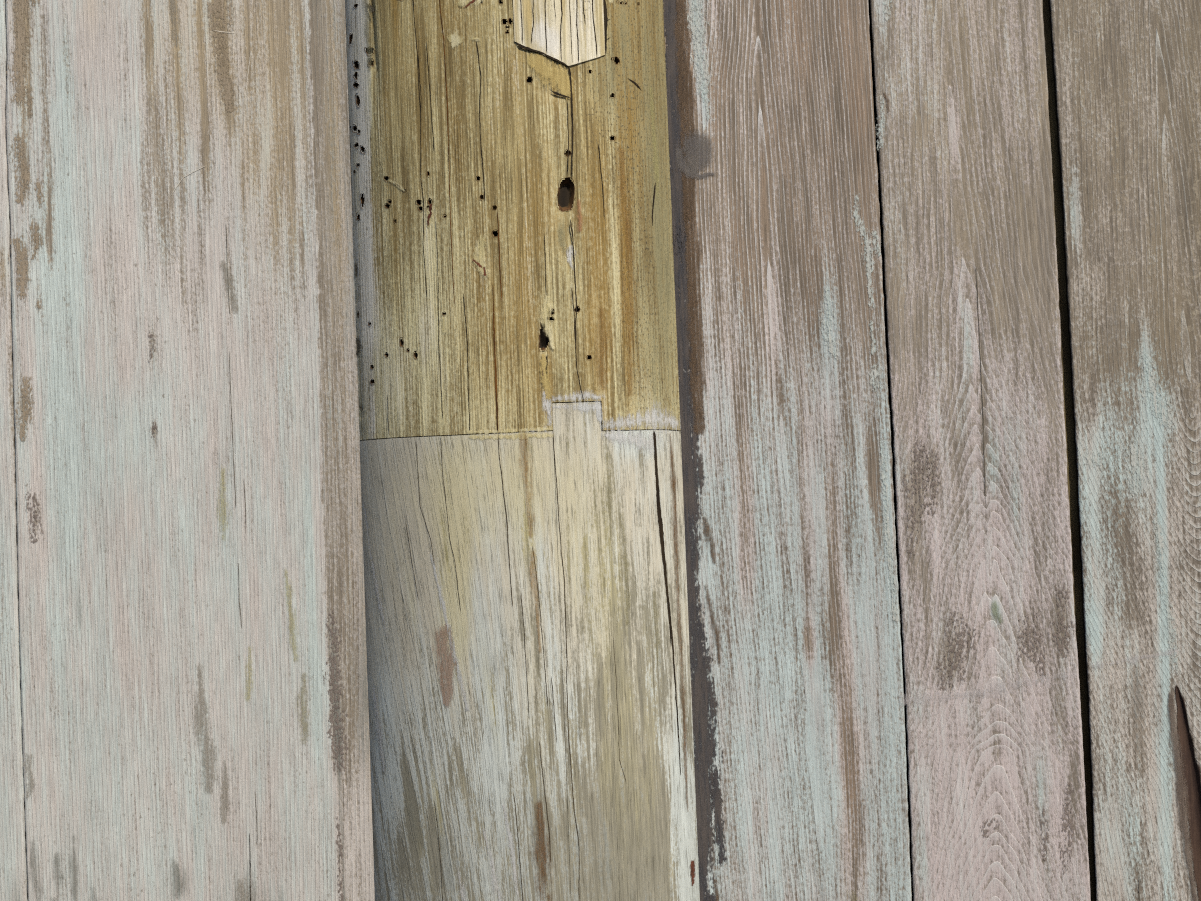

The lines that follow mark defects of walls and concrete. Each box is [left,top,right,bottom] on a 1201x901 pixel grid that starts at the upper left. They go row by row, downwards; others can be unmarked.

crack [653,431,681,773]